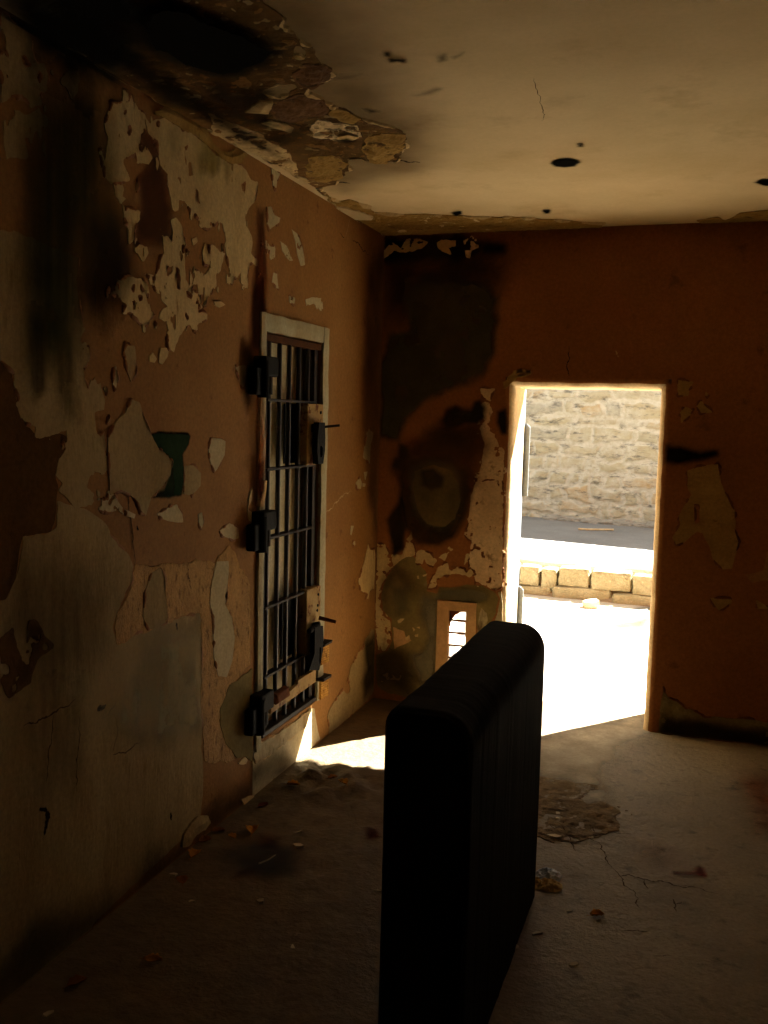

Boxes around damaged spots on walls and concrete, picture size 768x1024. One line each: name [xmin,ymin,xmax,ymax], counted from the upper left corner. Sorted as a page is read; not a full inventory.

leakage [85,210,131,319]
leakage [364,251,499,506]
flaking render [0,20,606,1005]
leakage [393,424,485,545]
spalling [537,776,632,844]
crack [550,818,717,932]